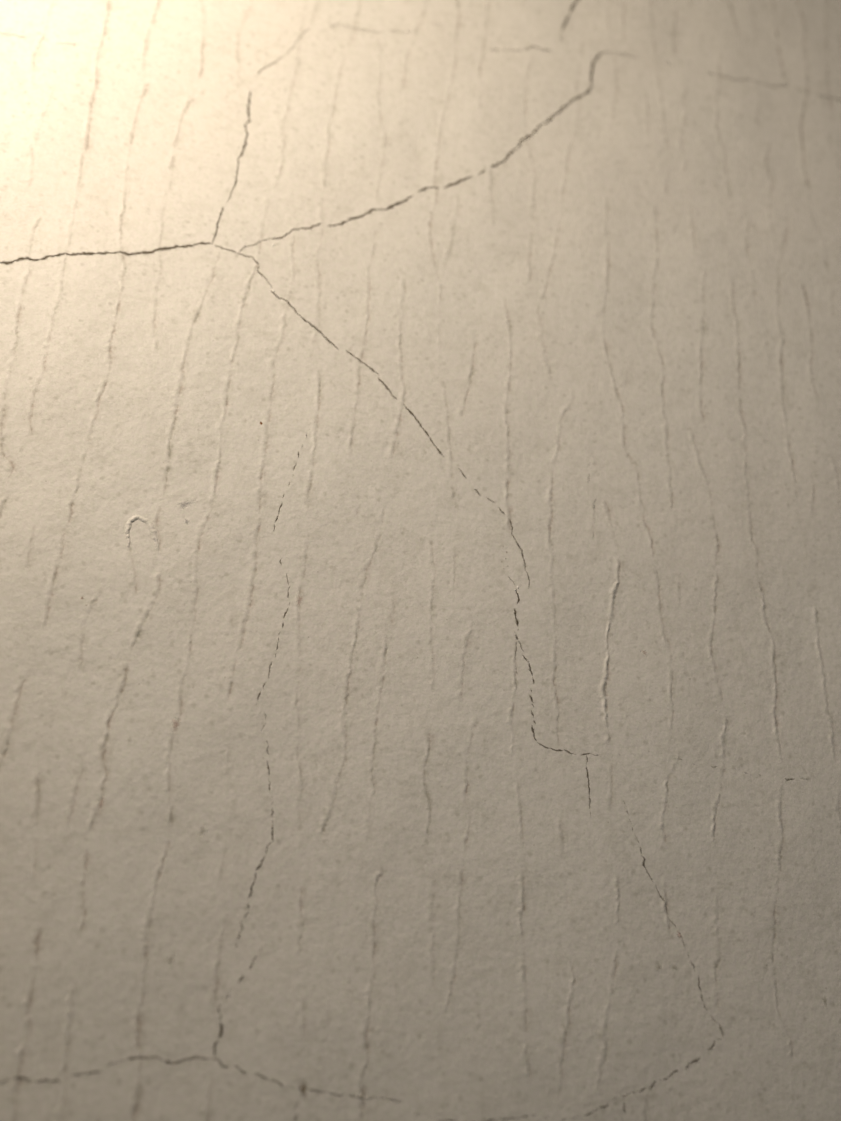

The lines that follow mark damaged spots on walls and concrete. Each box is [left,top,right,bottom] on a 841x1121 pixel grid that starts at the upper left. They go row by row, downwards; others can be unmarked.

crack [0,54,601,807]
crack [130,1010,282,1086]